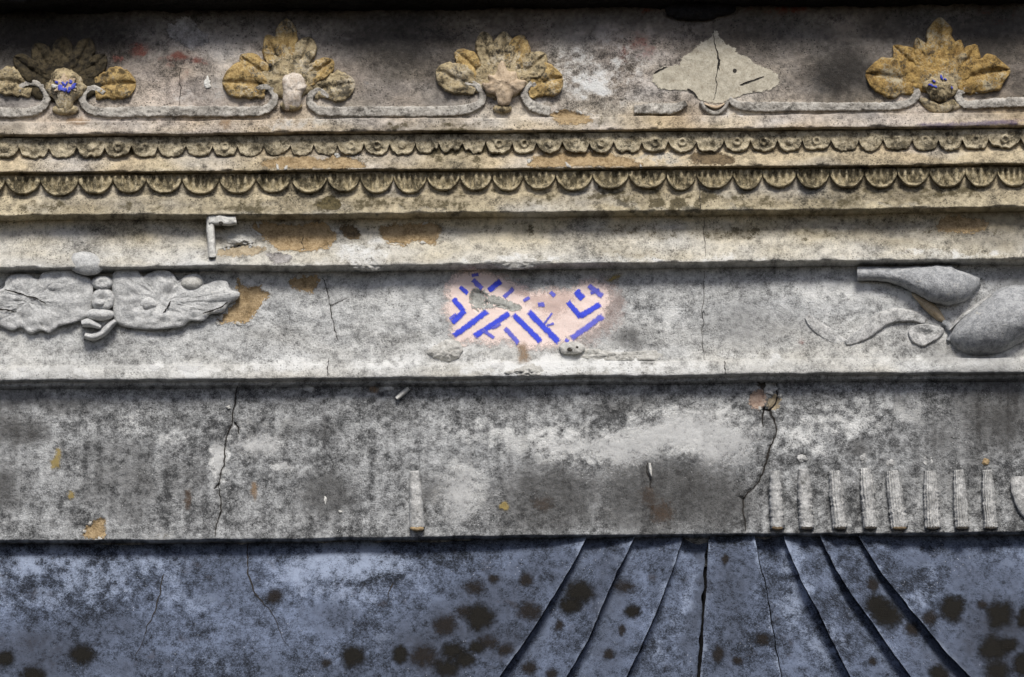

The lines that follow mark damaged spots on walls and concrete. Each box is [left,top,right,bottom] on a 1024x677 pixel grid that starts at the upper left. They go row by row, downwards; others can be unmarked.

spalling [217,195,361,264]
spalling [378,221,443,247]
spalling [215,277,270,326]
spalling [287,273,321,295]
crack [322,278,347,376]
crack [214,386,239,536]
crack [739,387,778,531]
spalling [82,517,107,542]
crack [135,574,164,655]
crack [246,543,289,646]